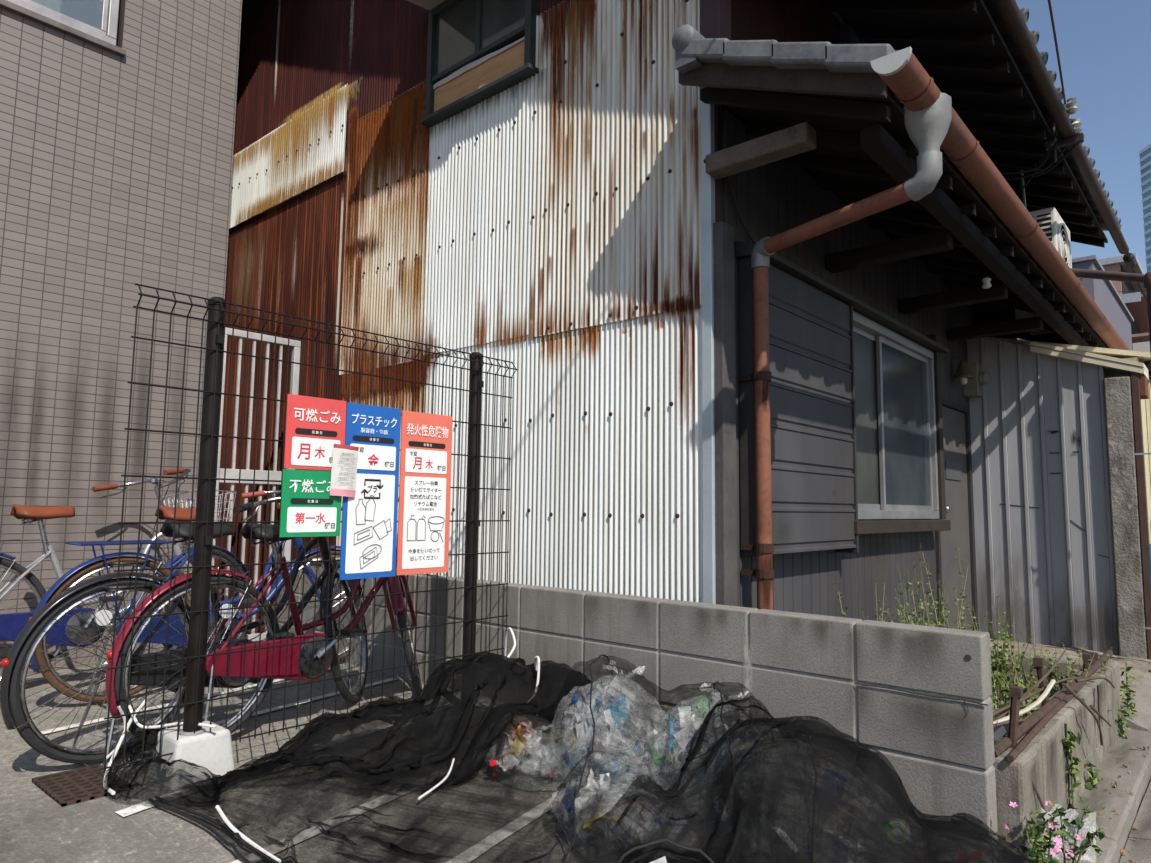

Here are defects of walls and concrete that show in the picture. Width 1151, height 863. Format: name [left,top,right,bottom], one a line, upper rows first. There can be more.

corrosion [541,0,596,113]
corrosion [622,0,652,94]
corrosion [233,81,449,413]
corrosion [553,123,590,197]
corrosion [593,169,613,234]
corrosion [683,108,698,186]
corrosion [475,257,600,357]
corrosion [610,227,699,418]